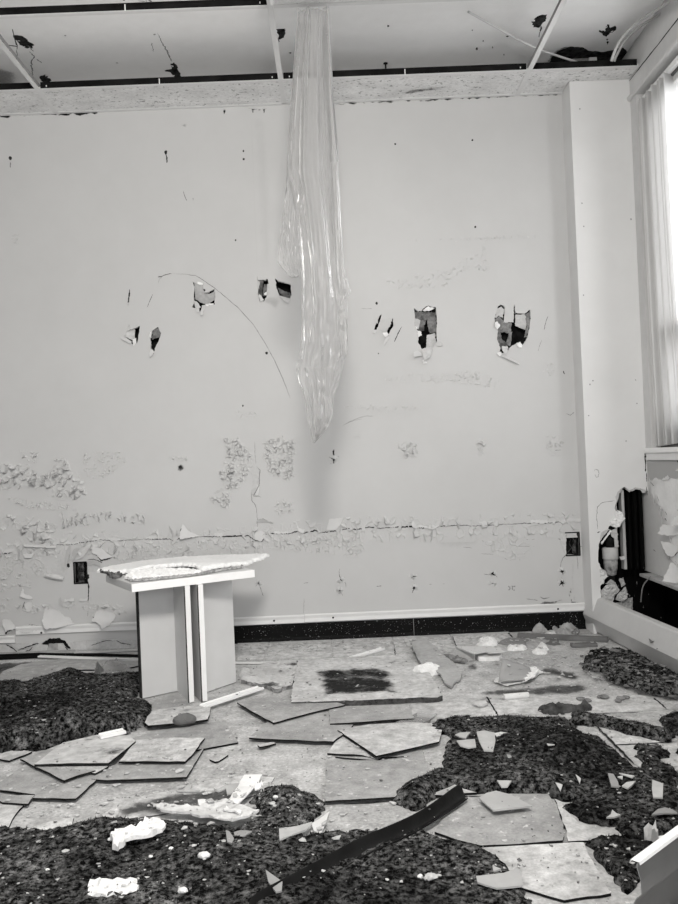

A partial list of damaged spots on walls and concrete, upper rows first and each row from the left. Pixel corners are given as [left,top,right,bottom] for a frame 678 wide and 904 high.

spalling [193,282,215,315]
spalling [121,325,161,357]
spalling [413,306,443,364]
spalling [495,304,531,365]
peeling [0,458,88,501]
peeling [209,435,298,510]
peeling [0,509,148,544]
peeling [44,541,111,580]
peeling [125,567,202,580]
spalling [598,460,678,623]